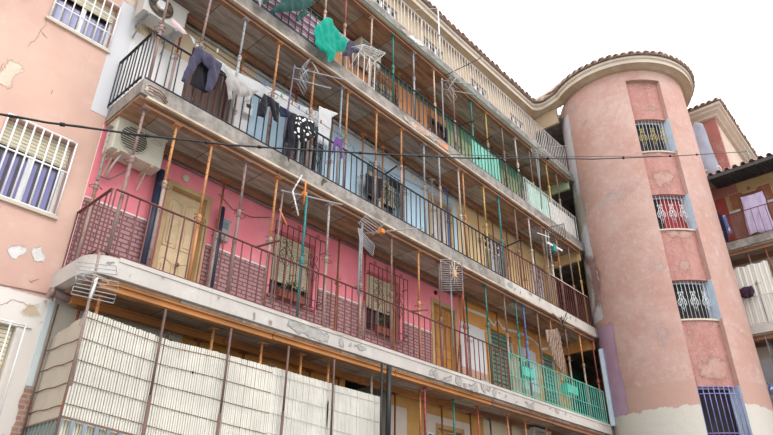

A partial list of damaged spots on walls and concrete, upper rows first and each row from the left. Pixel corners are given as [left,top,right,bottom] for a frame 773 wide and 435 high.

peeling [0,59,24,89]
peeling [7,245,46,262]
peeling [287,320,329,343]
flaking render [10,387,34,435]